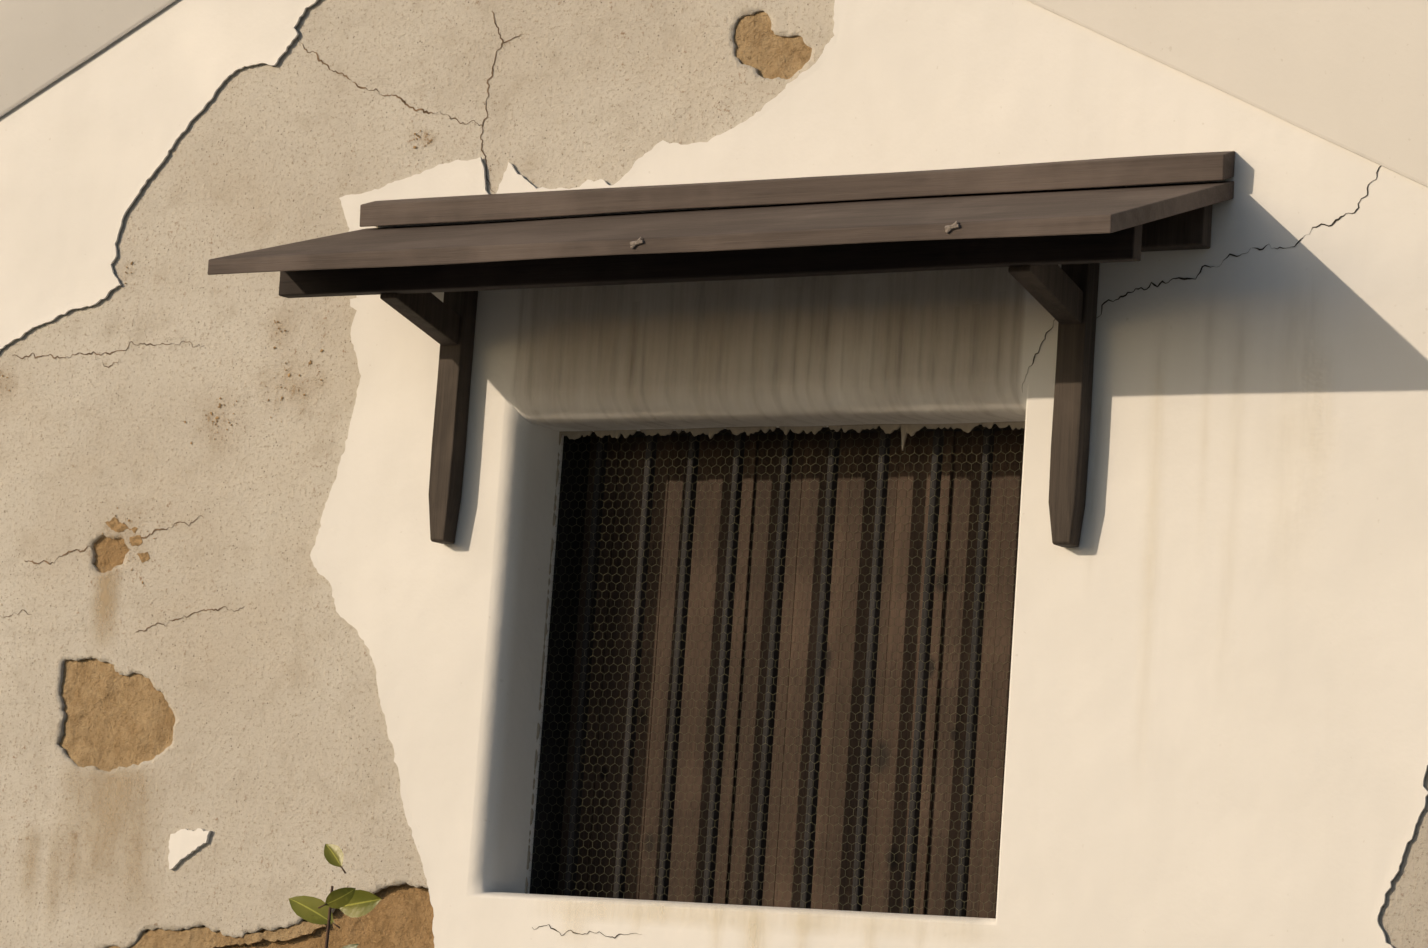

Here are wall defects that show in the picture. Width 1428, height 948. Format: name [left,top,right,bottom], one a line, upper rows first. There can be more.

crack [297,12,520,193]
crack [1097,166,1381,318]
crack [16,341,202,368]
crack [1022,321,1054,392]
crack [129,516,203,543]
peeling [0,0,835,948]
crack [137,606,242,632]
peeling [1378,769,1428,948]